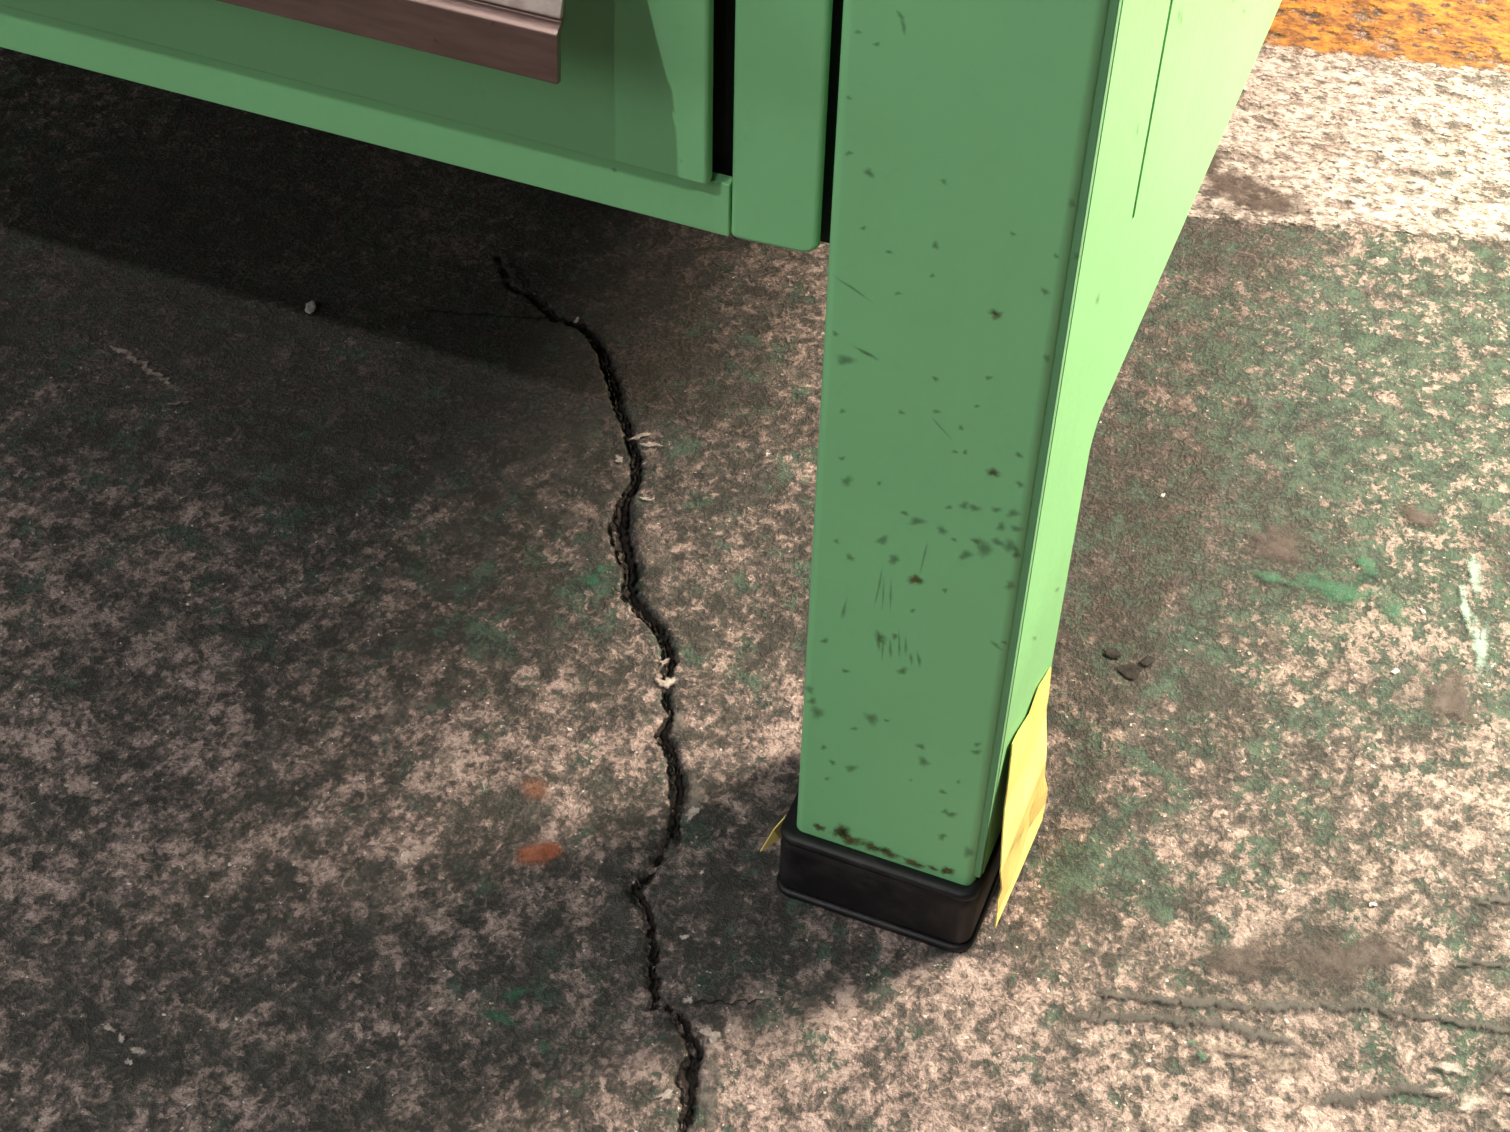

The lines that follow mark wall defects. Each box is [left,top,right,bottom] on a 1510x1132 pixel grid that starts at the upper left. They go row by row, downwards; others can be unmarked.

corrosion [519,844,561,863]
crack [432,261,767,1132]